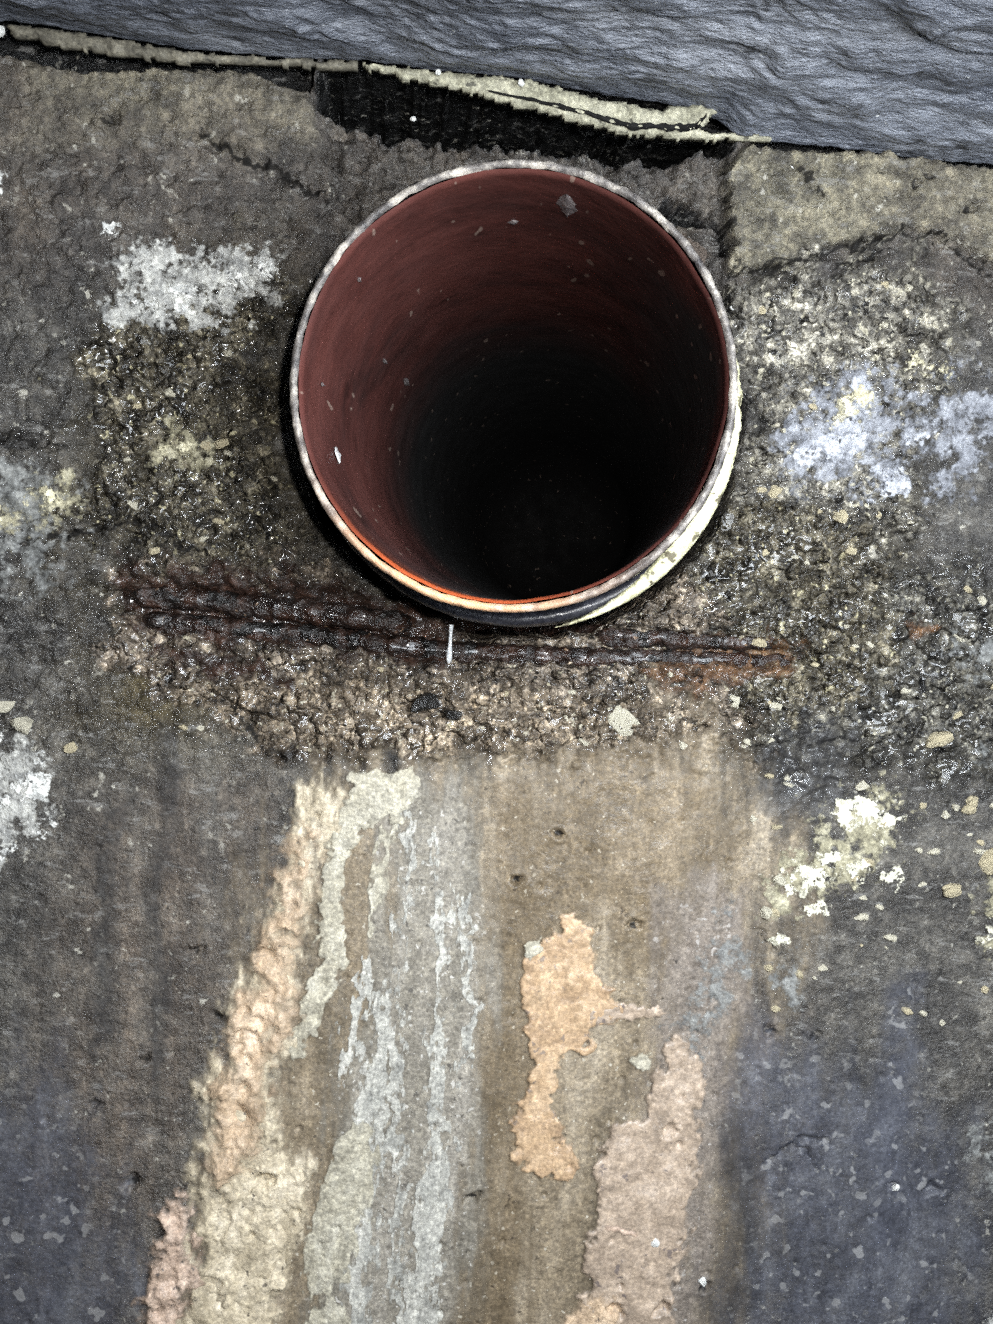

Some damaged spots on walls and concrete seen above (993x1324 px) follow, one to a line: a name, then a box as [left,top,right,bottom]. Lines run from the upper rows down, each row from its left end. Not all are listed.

leakage [96,221,286,345]
leakage [768,350,993,506]
corrosion [113,559,458,691]
corrosion [643,634,793,698]
leakage [0,730,62,871]
leakage [970,876,993,960]
leakage [260,694,913,1324]
peeling [509,913,707,1324]
leakage [790,1107,945,1324]
leakage [181,1284,192,1321]